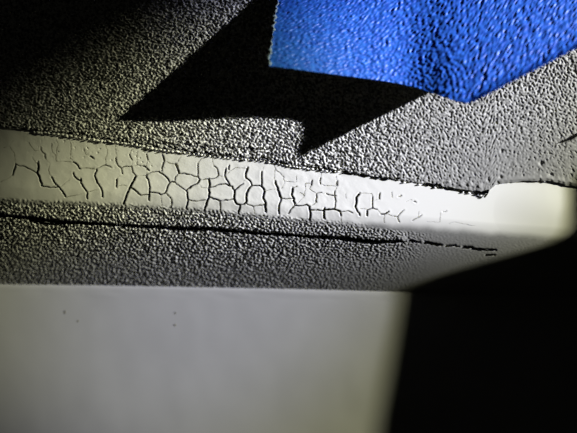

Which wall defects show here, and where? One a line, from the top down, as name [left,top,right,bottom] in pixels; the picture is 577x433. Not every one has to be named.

crack [1,139,446,222]
crack [0,213,495,256]